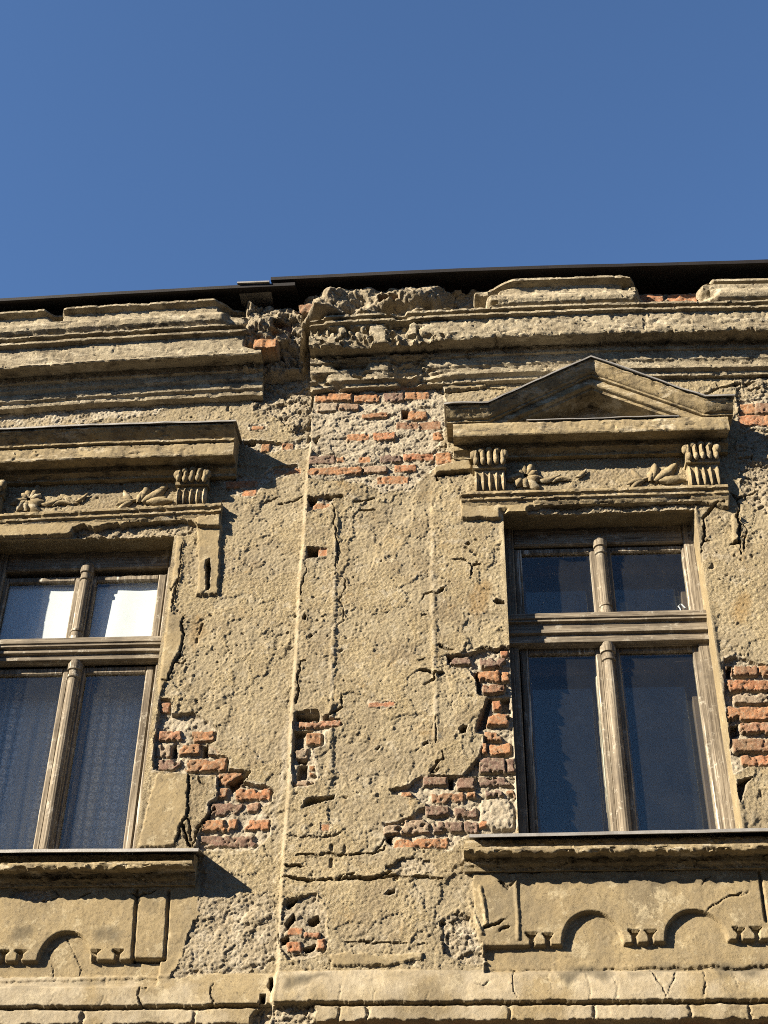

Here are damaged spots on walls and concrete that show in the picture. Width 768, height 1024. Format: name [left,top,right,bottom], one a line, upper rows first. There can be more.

flaking render [223,286,487,514]
crack [263,492,376,629]
crack [700,490,758,567]
crack [174,774,216,848]
flaking render [150,695,277,853]
crack [293,659,306,705]
flaking render [289,707,345,811]
crack [323,693,345,721]
flaking render [381,644,518,897]
flaking render [720,654,768,805]
flaking render [169,890,332,1024]